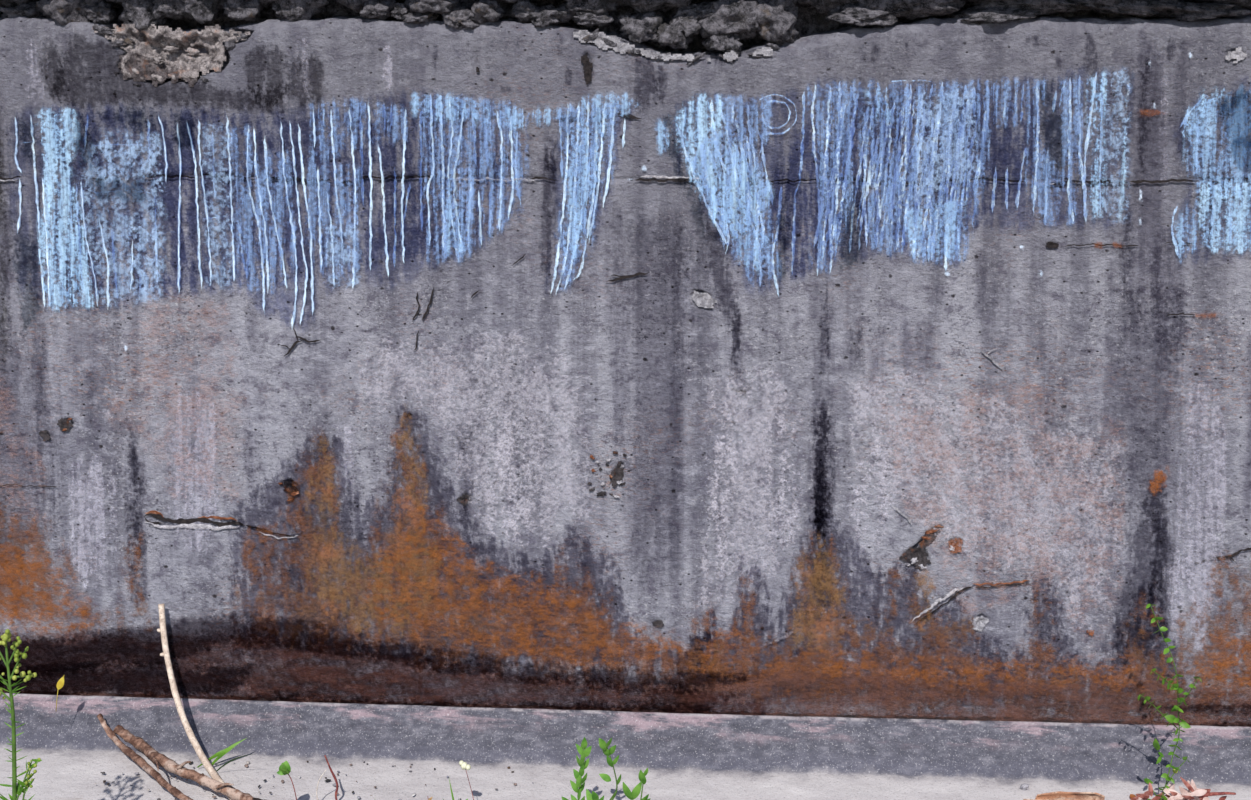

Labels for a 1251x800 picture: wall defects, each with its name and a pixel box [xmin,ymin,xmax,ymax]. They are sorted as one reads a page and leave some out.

spalling [92,23,250,87]
crack [144,510,298,539]
rust [0,426,1251,727]
spalling [899,524,963,569]
damp [0,614,746,714]
damp [1166,705,1251,727]